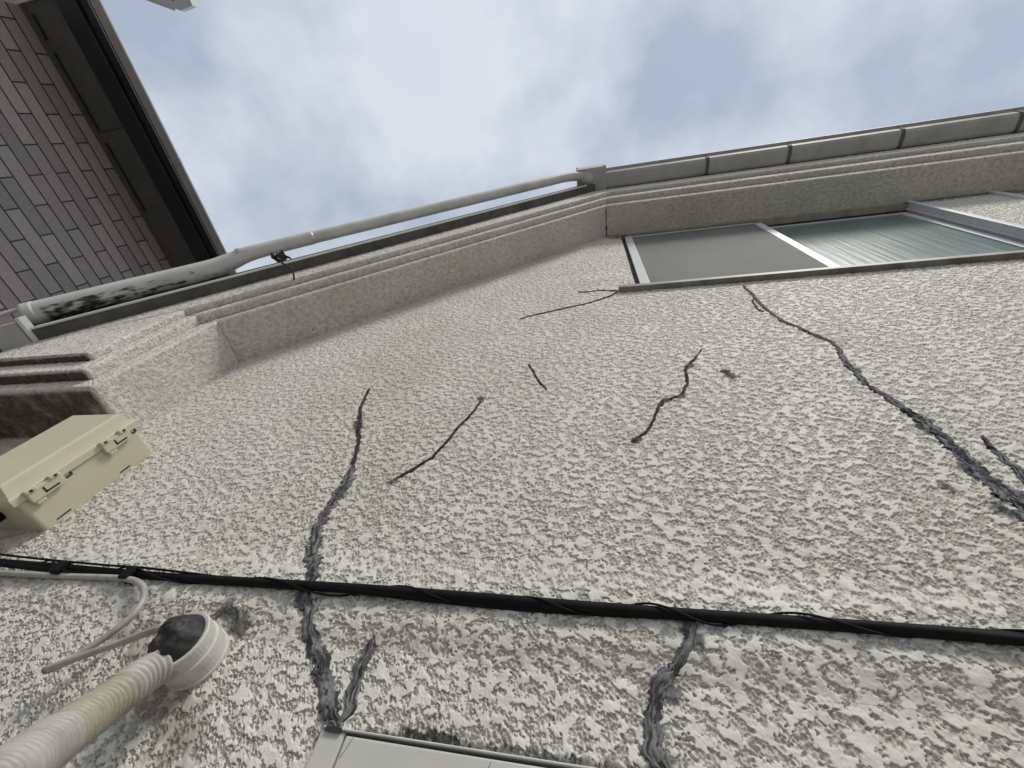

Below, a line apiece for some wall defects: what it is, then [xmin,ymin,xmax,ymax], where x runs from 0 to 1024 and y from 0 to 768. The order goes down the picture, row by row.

crack [520,290,618,319]
crack [389,396,484,484]
crack [528,364,547,390]
crack [631,349,702,443]
crack [742,285,1024,522]
crack [290,388,376,740]
crack [640,621,705,768]